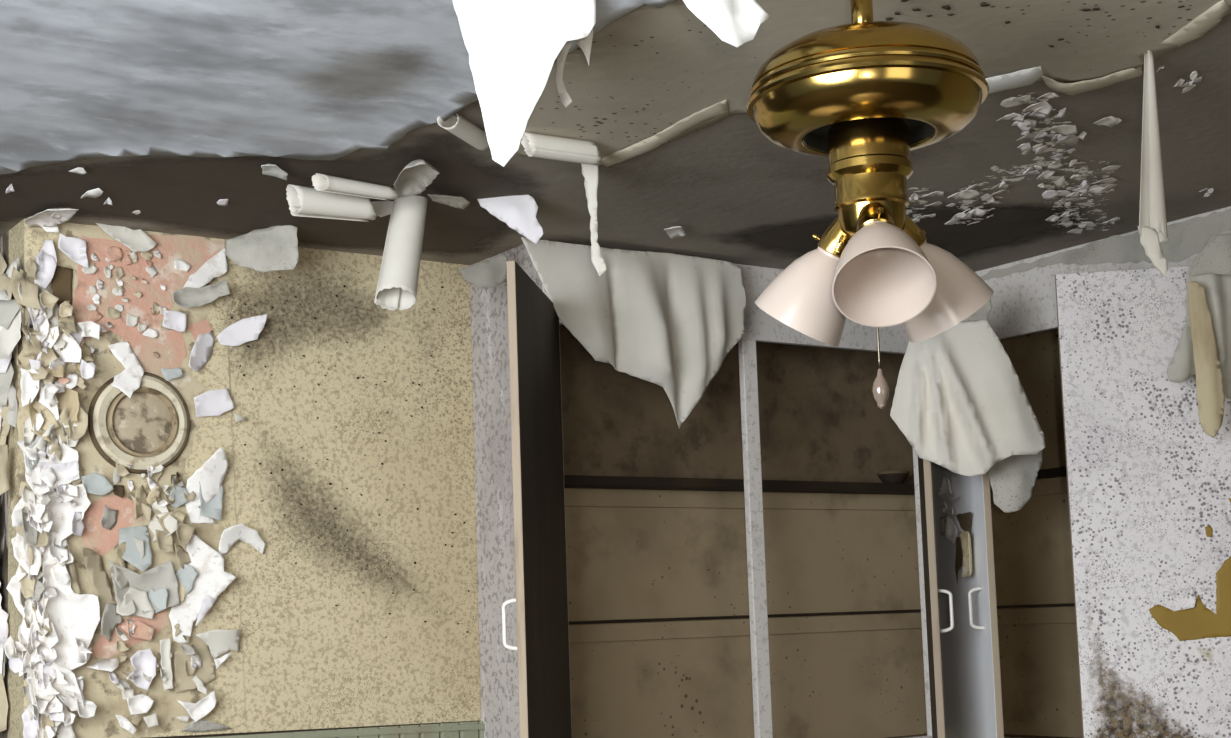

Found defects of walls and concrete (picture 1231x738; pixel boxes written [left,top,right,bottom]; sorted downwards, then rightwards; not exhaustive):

water stain [885,0,954,21]
peeling [1172,71,1202,93]
peeling [393,159,470,209]
peeling [906,92,1122,234]
peeling [664,226,686,239]
flaking render [15,188,267,738]
peeling [1149,557,1231,641]
water stain [1096,656,1192,738]